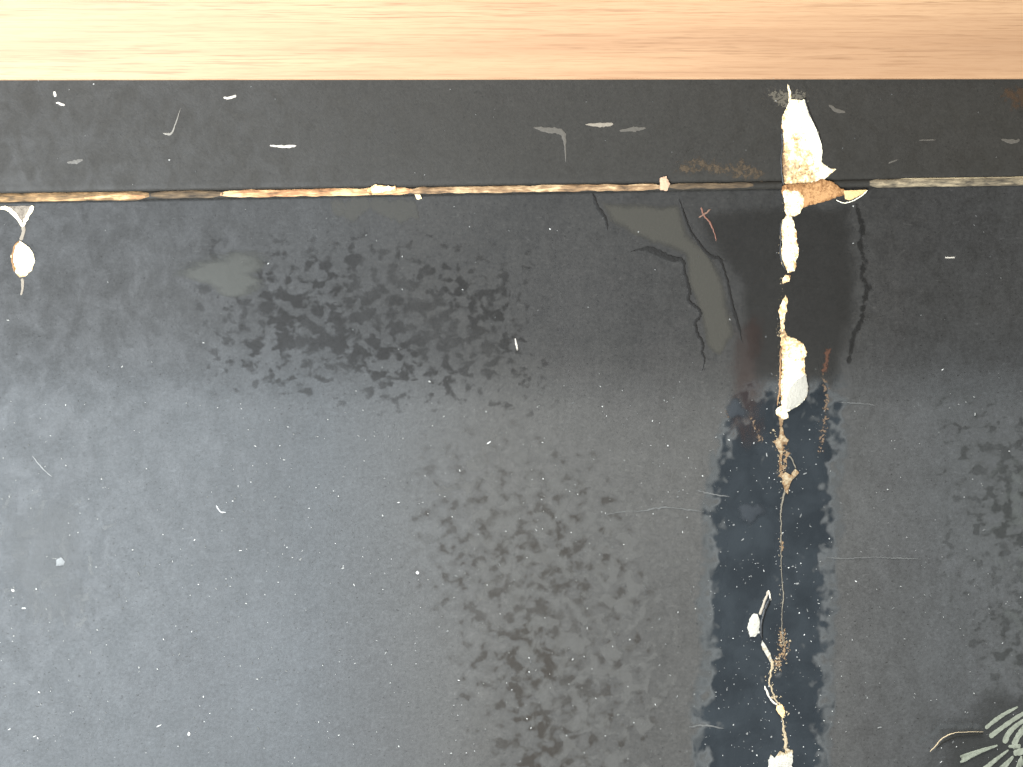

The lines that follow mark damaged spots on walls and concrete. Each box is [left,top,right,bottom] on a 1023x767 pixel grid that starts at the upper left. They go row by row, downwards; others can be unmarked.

peeling [780,84,868,216]
peeling [0,205,35,295]
crack [747,208,808,767]
damp [692,379,847,767]
damp [480,624,589,767]